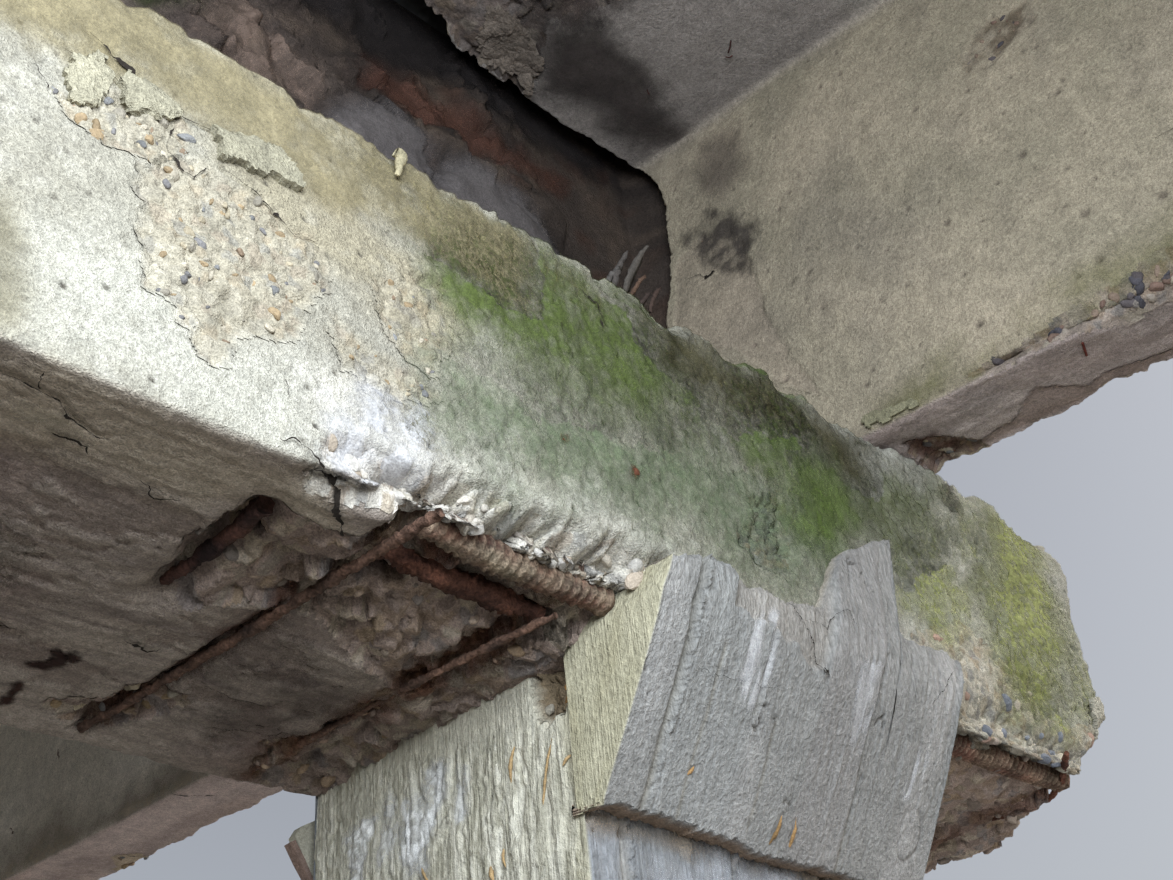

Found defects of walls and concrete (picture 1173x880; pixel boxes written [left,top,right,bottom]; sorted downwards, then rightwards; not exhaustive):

spalling [425,0,610,96]
water stain [540,0,683,144]
spalling [51,49,333,369]
water stain [685,210,753,271]
crack [0,373,105,454]
crack [280,437,344,536]
corrosion [0,682,24,705]
corrosion [25,650,81,671]
corrosion [102,580,298,712]
spalling [42,430,649,797]
corrosion [393,627,502,700]
spalling [910,617,1106,874]